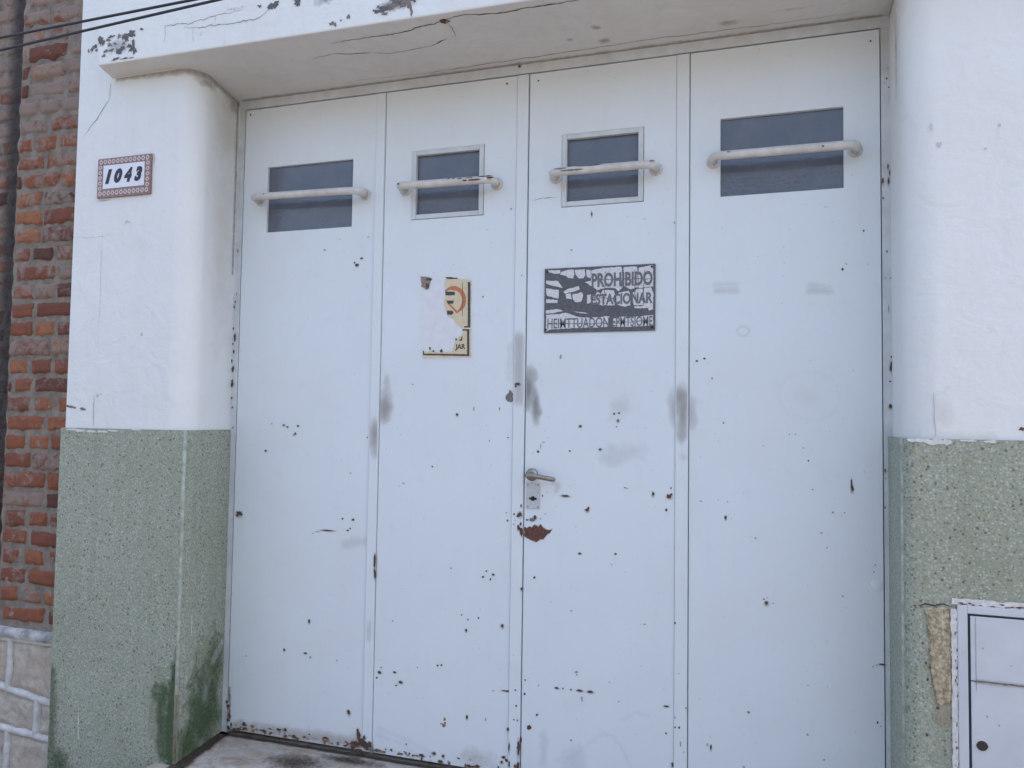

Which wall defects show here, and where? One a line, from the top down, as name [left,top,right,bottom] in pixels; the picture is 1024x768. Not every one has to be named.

spalling [88,28,143,61]
spalling [373,0,416,17]
crack [312,0,856,81]
rust [519,524,552,542]
spalling [925,598,1024,768]
rust [225,688,480,768]